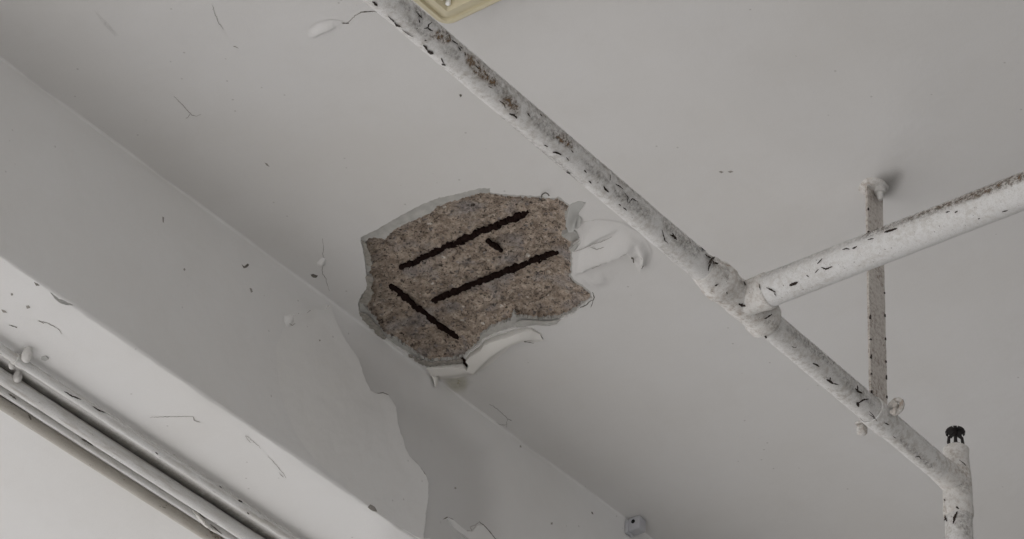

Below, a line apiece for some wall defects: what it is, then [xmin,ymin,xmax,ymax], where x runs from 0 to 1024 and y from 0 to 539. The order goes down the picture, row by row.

spalling [358,188,595,379]
peeling [276,305,429,539]